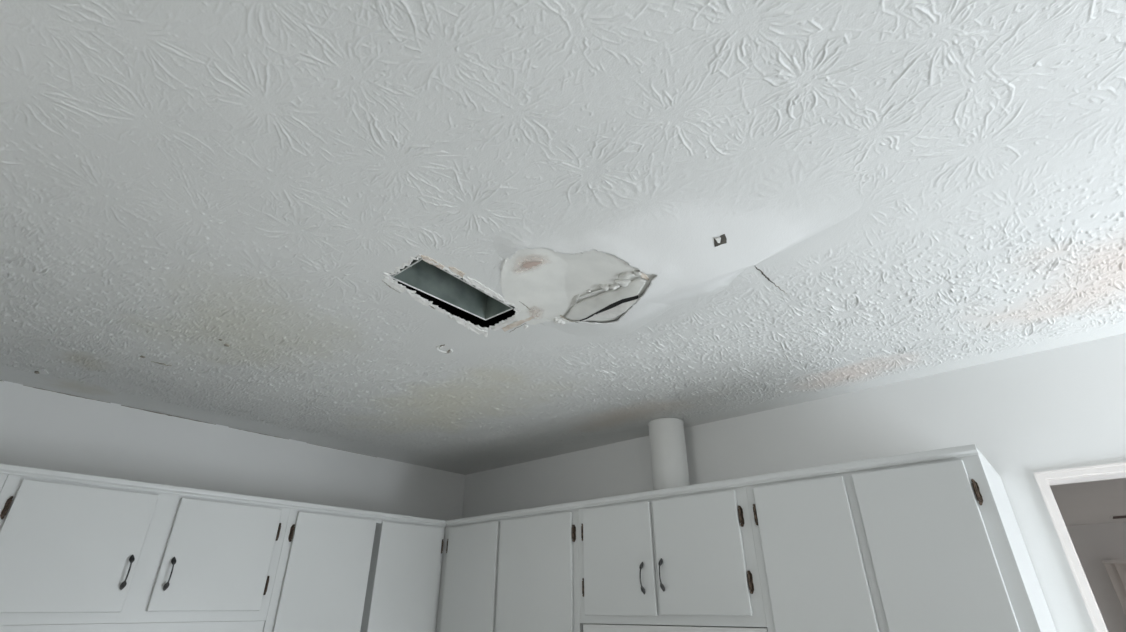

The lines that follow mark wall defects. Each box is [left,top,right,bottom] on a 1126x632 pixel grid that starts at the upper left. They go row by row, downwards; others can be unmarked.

peeling [382,248,656,337]